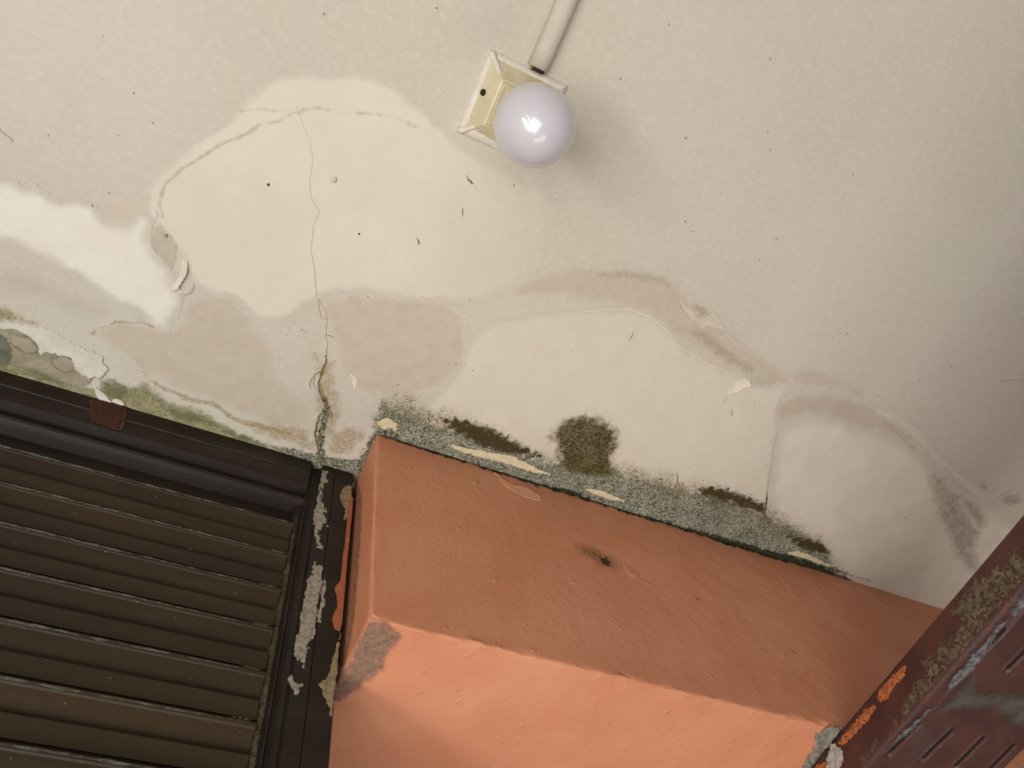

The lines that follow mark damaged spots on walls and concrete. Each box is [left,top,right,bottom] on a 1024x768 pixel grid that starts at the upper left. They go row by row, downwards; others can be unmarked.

crack [296,106,332,467]
spalling [0,321,125,406]
damp [0,62,1024,609]
corrosion [89,399,127,430]
peeling [451,444,550,501]
peeling [586,488,625,502]